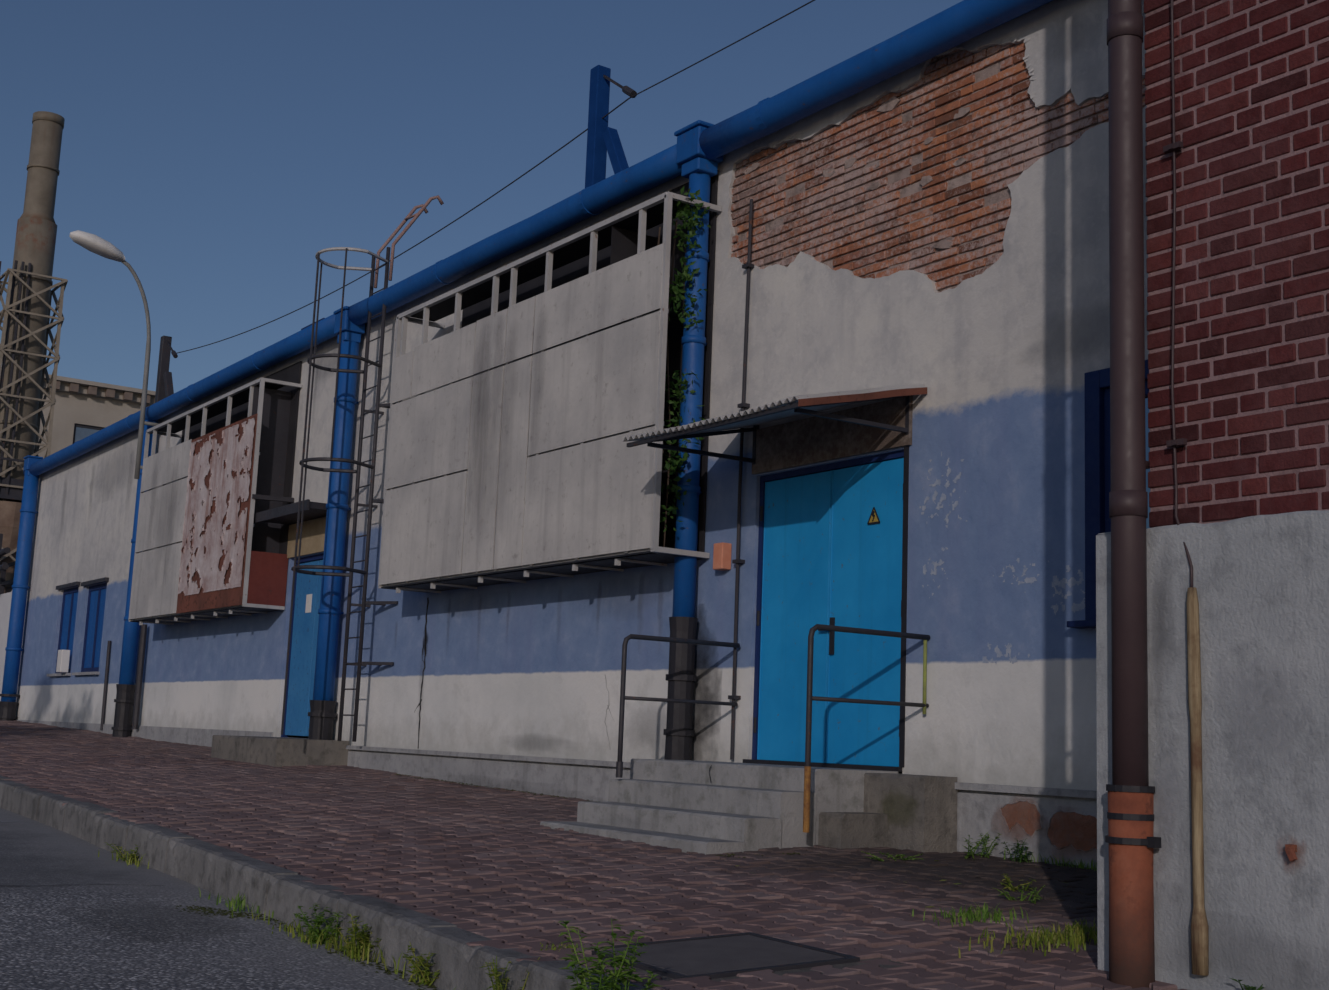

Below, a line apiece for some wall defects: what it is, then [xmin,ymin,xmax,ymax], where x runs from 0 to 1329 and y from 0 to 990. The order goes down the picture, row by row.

spalling [730,33,1109,293]
spalling [1000,800,1097,852]